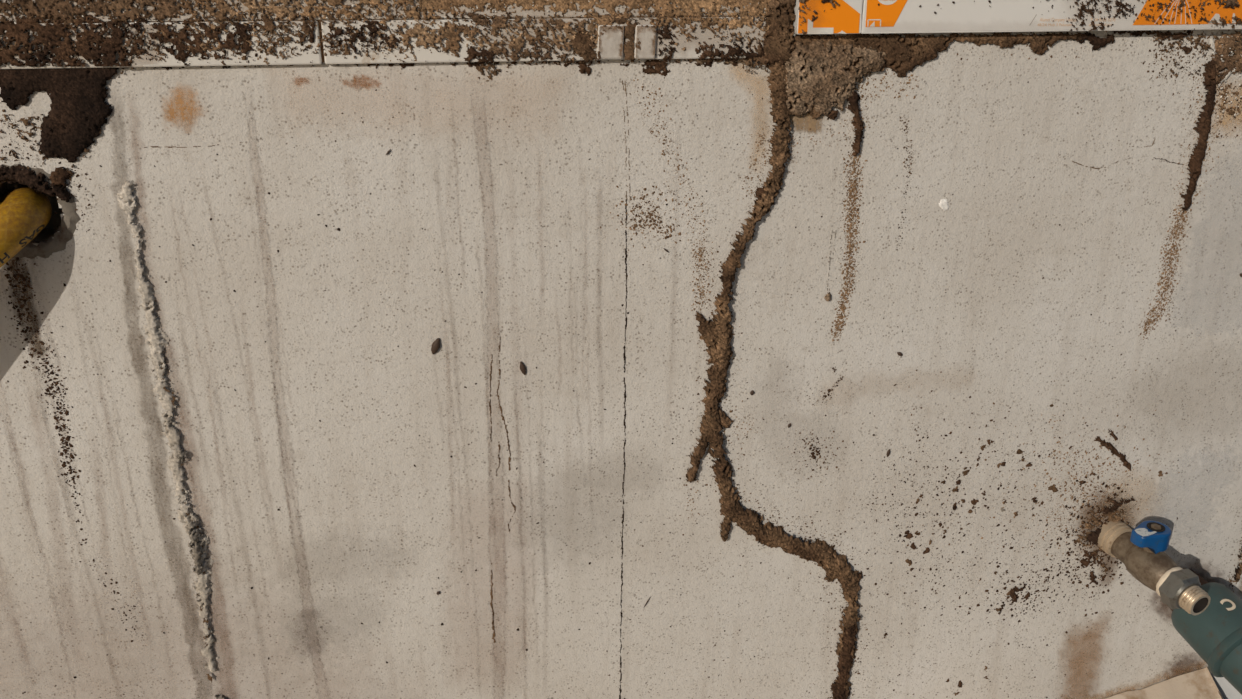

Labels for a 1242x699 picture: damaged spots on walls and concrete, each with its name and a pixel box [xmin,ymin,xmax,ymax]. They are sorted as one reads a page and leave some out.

crack [619,80,630,699]